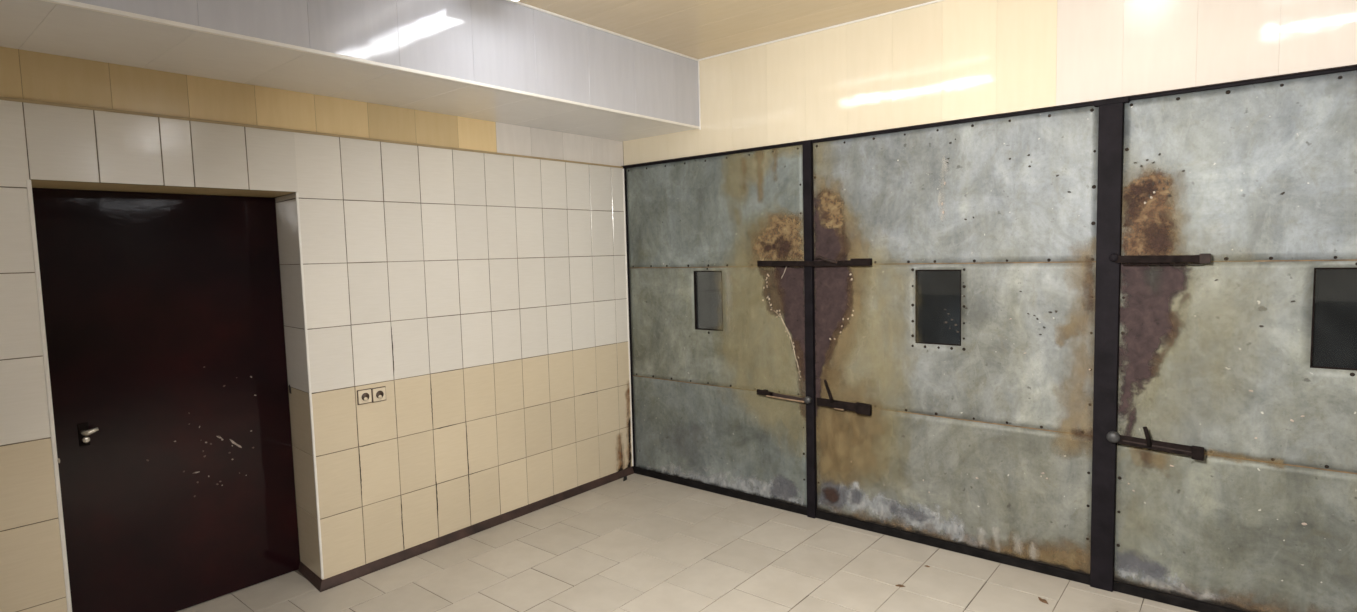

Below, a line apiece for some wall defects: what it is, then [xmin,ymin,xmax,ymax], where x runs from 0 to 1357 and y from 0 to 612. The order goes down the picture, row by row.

leakage [618,388,631,472]
peeling [762,274,801,380]
corrosion [753,185,1090,572]
corrosion [1118,172,1189,436]
leakage [649,464,803,505]
leakage [820,482,979,547]